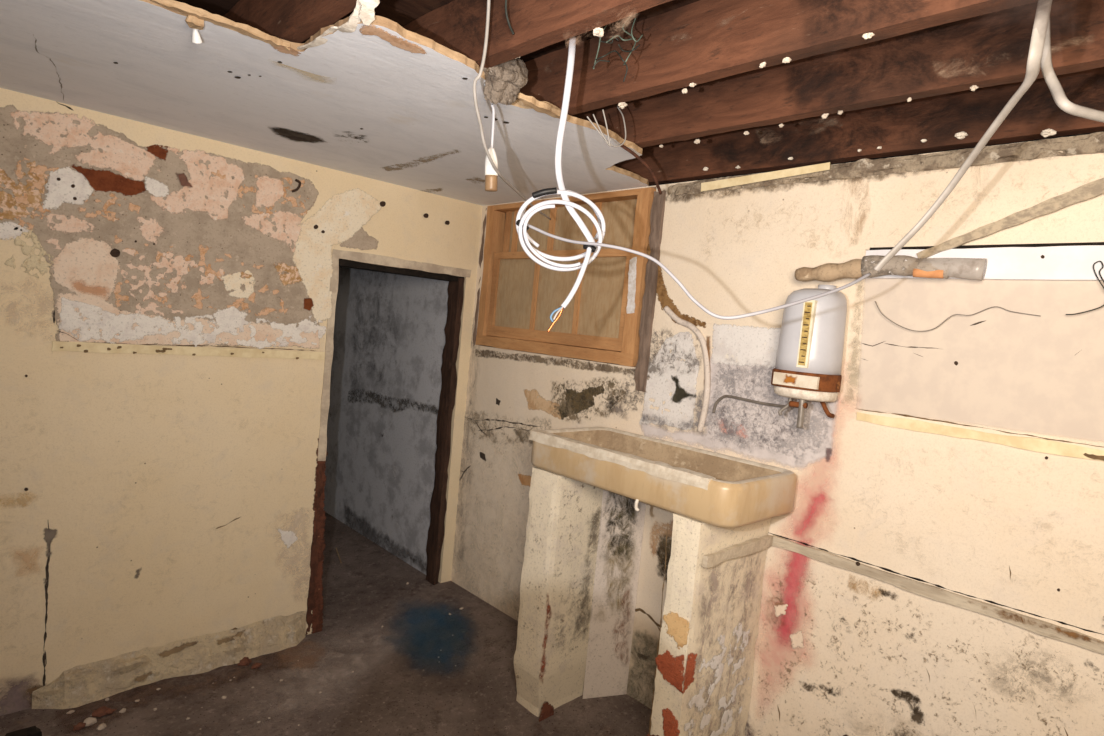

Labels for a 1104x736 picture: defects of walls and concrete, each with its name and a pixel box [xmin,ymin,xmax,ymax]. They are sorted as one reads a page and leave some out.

crack [33,35,73,110]
water stain [272,128,366,143]
flaking render [0,105,319,342]
water stain [550,332,831,461]
crack [42,523,51,686]
spalling [159,641,197,657]
water stain [587,492,636,608]
water stain [627,633,660,705]
water stain [657,537,672,580]
peeling [645,611,750,736]
water stain [696,558,755,736]
water stain [779,594,979,736]